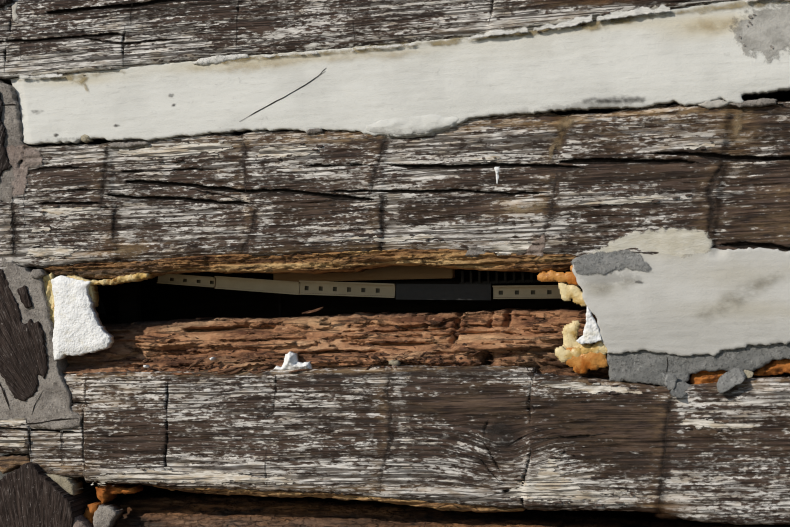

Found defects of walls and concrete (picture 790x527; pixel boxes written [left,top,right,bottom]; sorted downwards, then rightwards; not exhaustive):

crack [0,0,210,67]
spalling [730,2,790,63]
crack [21,68,790,251]
spalling [540,343,790,398]